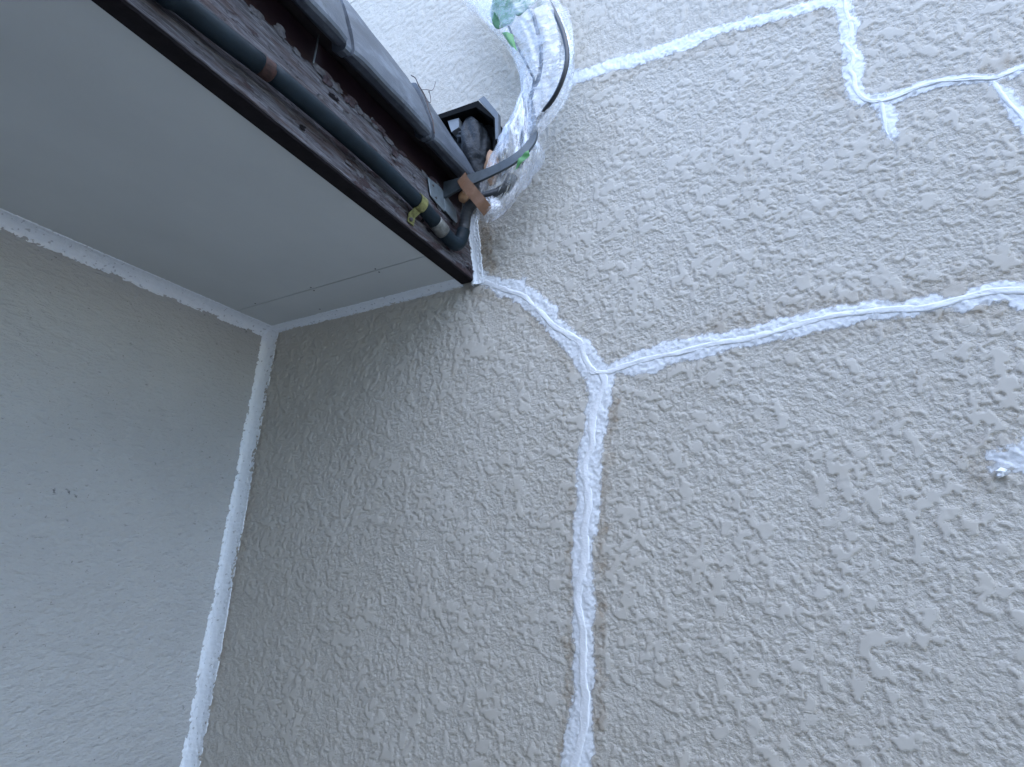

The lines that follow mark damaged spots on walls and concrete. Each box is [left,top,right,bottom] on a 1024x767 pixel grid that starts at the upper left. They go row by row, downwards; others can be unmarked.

peeling [248,4,407,162]
crack [567,0,1024,143]
crack [479,269,1024,767]